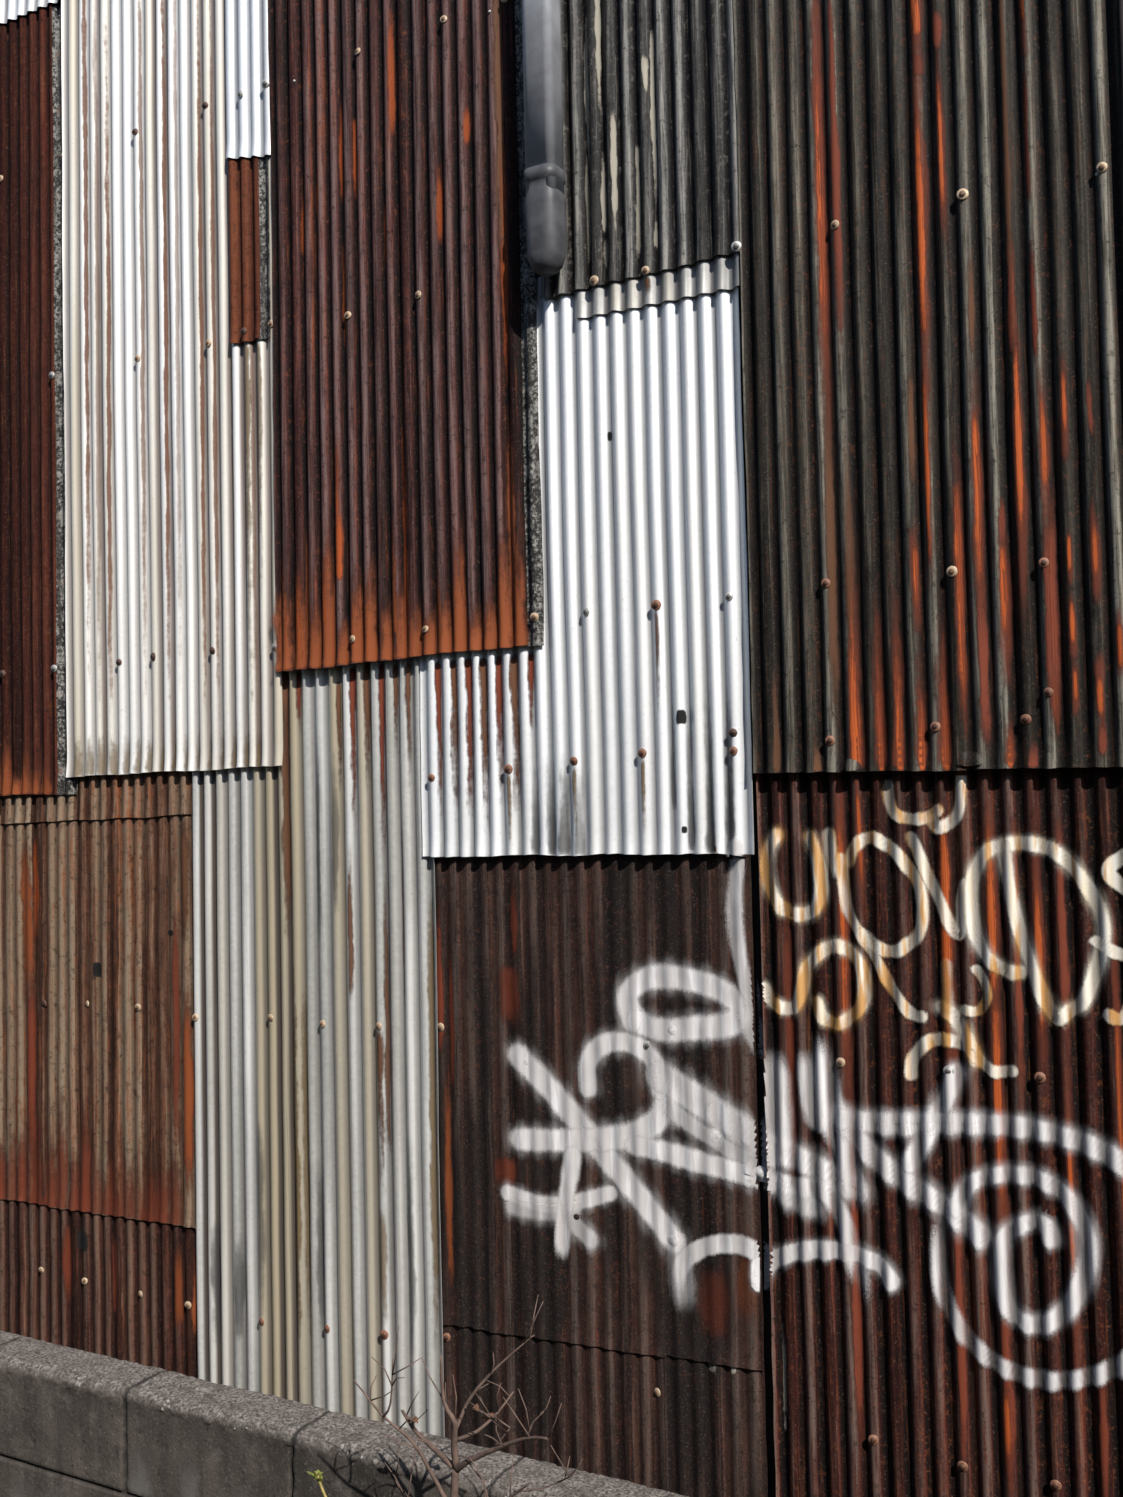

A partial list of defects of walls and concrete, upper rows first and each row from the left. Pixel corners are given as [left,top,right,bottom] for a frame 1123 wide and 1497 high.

rust [492,0,509,363]
rust [0,745,52,796]
rust [772,685,781,773]
rust [811,0,1123,1463]
rust [0,823,195,1302]
rust [377,911,391,1160]
rust [427,910,455,1310]
rust [496,1158,517,1187]
rust [783,927,798,1179]
rust [175,1259,197,1336]
rust [1000,1283,1017,1497]
rust [1099,1384,1109,1497]